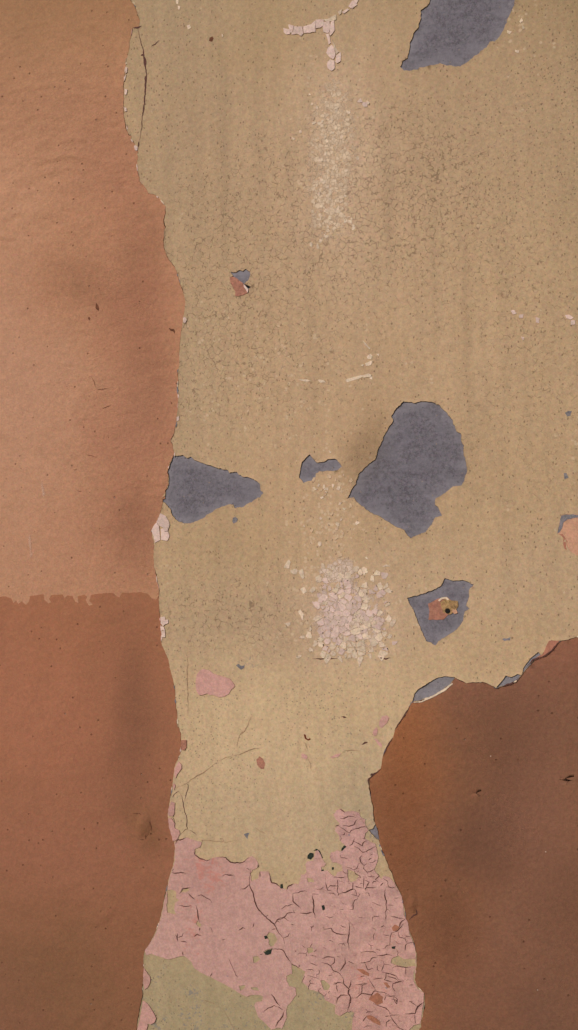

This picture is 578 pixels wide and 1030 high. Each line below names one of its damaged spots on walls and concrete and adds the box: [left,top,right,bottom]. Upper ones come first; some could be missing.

peeling [283,0,358,71]
spalling [400,0,524,71]
spalling [230,269,250,296]
peeling [346,341,379,382]
spalling [151,455,264,543]
spalling [284,401,474,667]
spalling [557,514,578,555]
spalling [413,676,455,703]
spalling [497,640,559,687]
crack [134,719,422,1030]
peeling [145,802,424,1030]
peeling [137,968,156,1030]